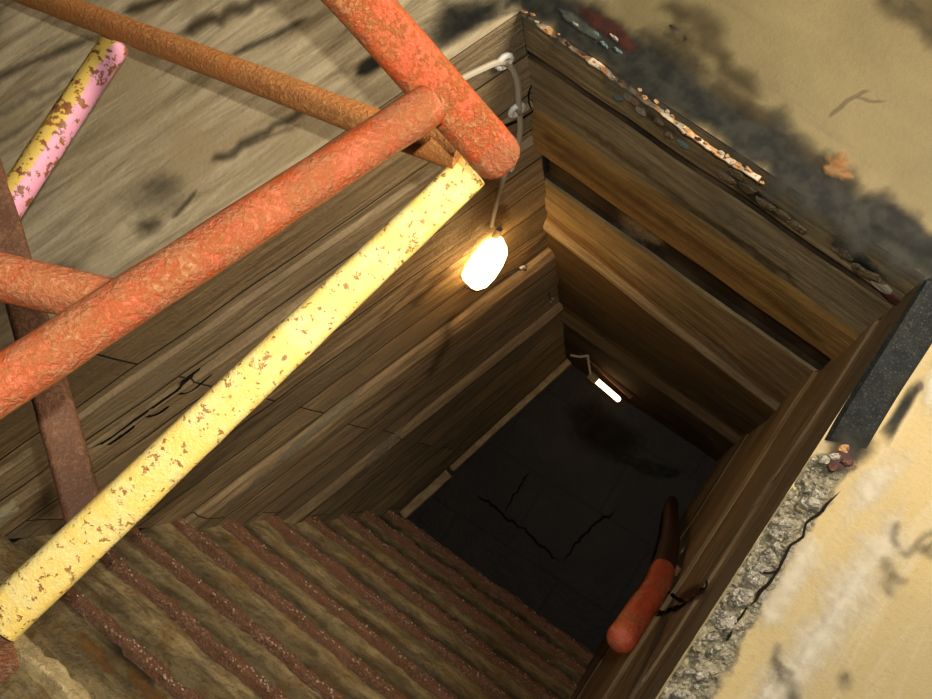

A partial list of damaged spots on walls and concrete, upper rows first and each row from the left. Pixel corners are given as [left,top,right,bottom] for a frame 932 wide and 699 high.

water stain [360,57,381,74]
water stain [429,0,932,282]
crack [479,473,614,559]
spalling [658,454,858,699]
crack [726,493,838,641]
rust [119,635,184,691]